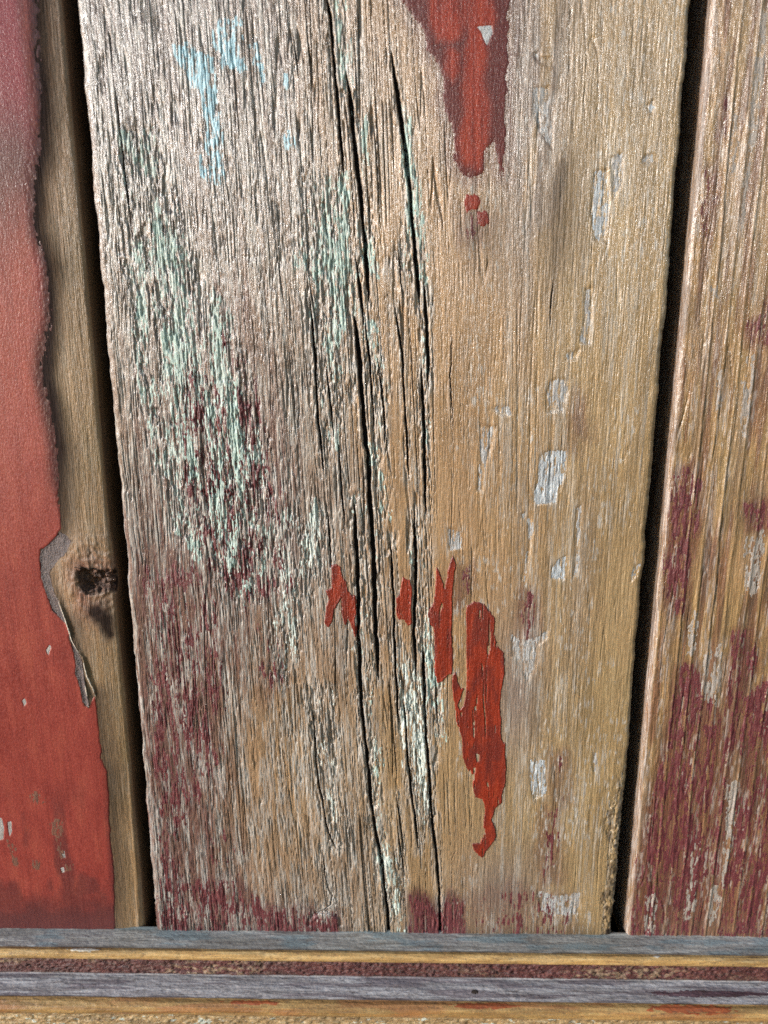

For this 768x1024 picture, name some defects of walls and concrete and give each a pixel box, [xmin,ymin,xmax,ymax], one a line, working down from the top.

peeling [402,0,511,178]
peeling [464,194,489,227]
crack [310,0,455,930]
peeling [40,532,94,707]
peeling [324,564,358,637]
peeling [396,577,413,626]
peeling [428,529,548,858]
peeling [686,610,723,707]
peeling [743,529,765,598]
peeling [683,780,738,927]
peeling [644,893,658,936]